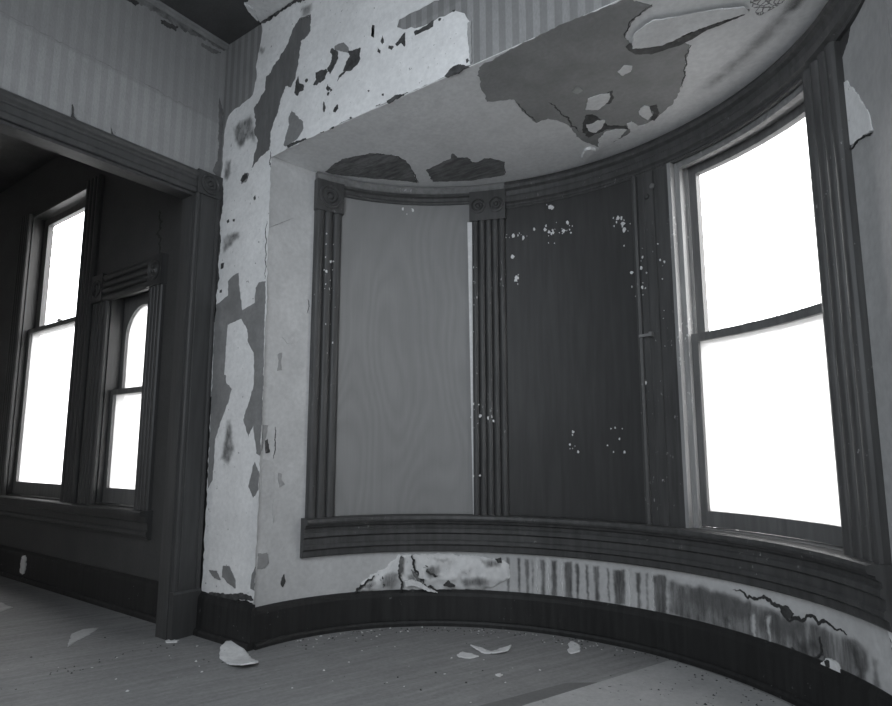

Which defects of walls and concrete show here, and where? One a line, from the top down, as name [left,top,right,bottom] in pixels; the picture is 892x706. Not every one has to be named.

crack [750,0,785,16]
peeling [844,80,873,150]
flaking render [202,0,749,603]
water stain [507,559,598,600]
water stain [614,571,640,607]
water stain [653,576,867,679]